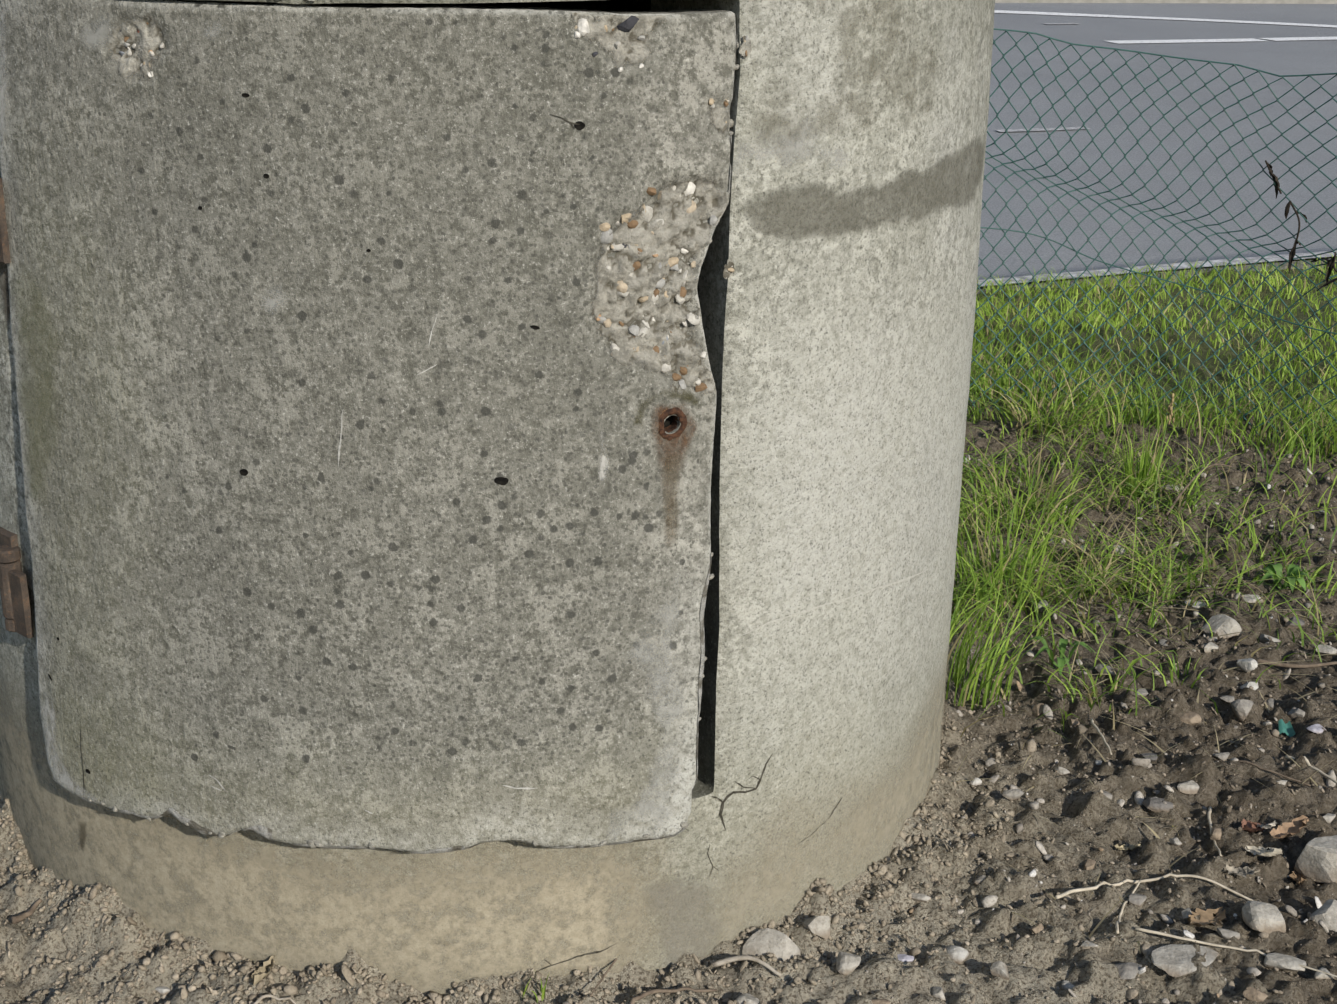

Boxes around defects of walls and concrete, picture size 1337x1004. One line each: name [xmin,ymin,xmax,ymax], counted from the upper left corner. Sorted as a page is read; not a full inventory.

spalling [105,16,164,79]
water stain [750,145,984,235]
spalling [593,165,731,395]
spalling [723,260,735,279]
crack [707,753,773,878]